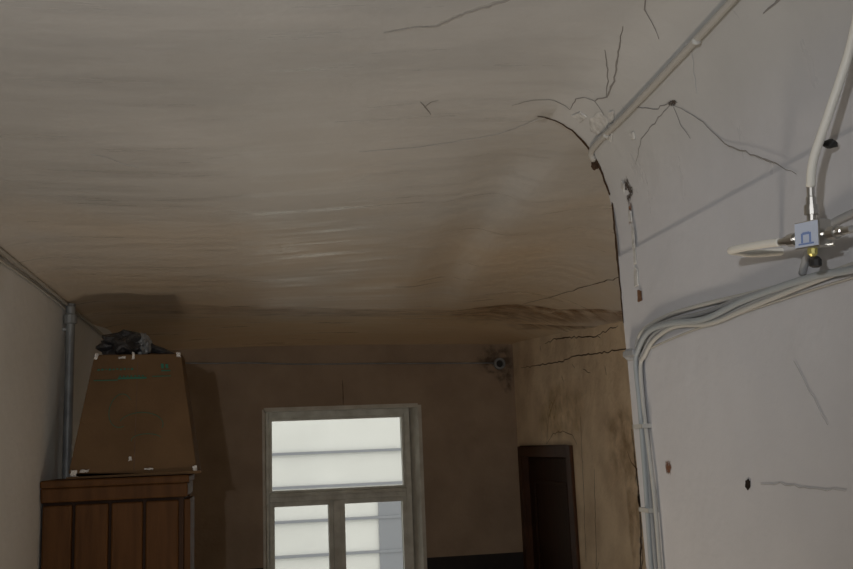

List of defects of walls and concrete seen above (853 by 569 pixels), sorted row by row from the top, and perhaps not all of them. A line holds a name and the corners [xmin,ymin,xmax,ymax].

crack [384,0,508,33]
crack [362,27,623,152]
crack [635,102,796,174]
crack [524,327,626,379]
crack [628,429,643,569]